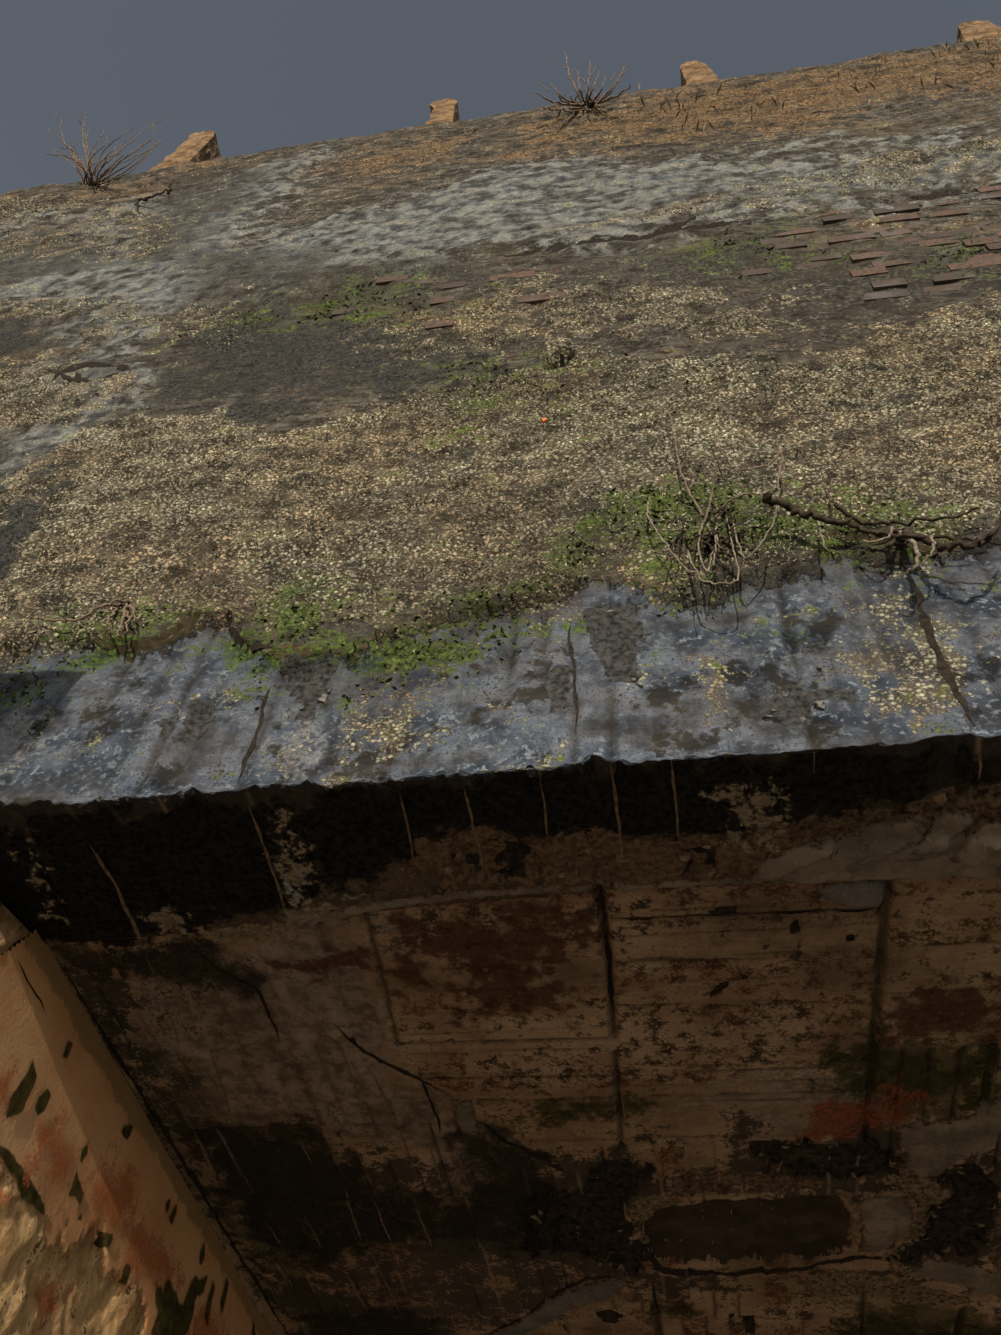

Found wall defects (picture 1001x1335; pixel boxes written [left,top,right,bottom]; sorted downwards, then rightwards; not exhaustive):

leakage [143,309,454,424]
leakage [0,459,81,579]
leakage [0,741,1001,998]
crack [18,960,46,1013]
crack [335,1025,446,1132]
crack [56,957,288,1335]
leakage [177,1121,576,1272]
spalling [530,1130,902,1276]
crack [491,1248,887,1333]